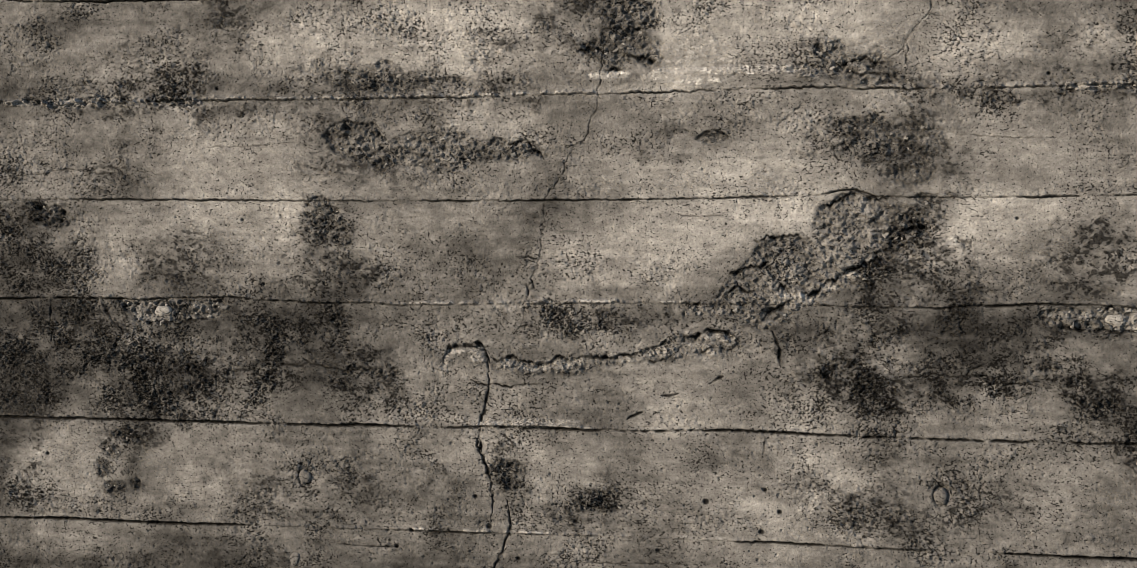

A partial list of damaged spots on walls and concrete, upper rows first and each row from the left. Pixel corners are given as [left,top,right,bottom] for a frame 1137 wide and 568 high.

spalling [579,0,663,73]
crack [510,129,589,191]
spalling [695,129,728,145]
peeling [837,115,946,186]
spalling [683,189,930,330]
crack [474,328,737,568]